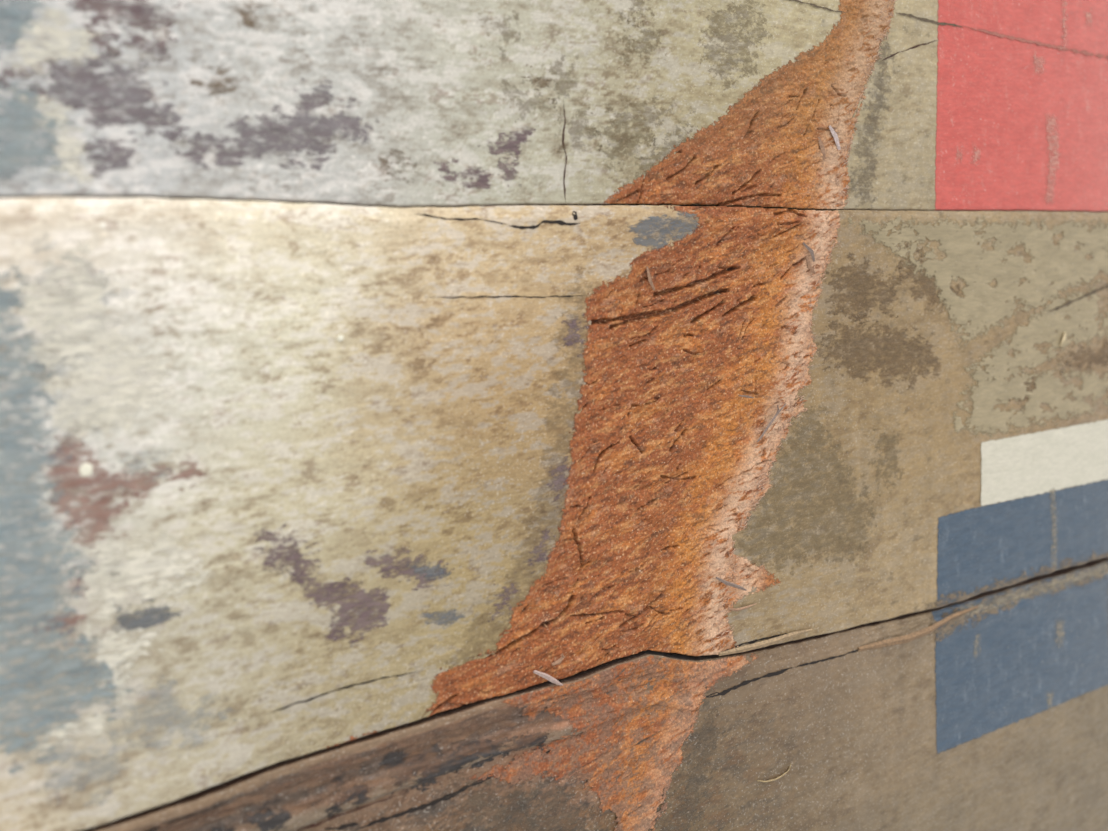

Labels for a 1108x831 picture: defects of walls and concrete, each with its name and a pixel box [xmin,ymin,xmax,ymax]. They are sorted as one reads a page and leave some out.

crack [793,0,847,13]
crack [882,13,1108,61]
crack [419,98,580,229]
crack [722,633,788,652]
crack [271,671,417,713]
crack [706,649,858,697]
crack [149,802,228,831]
crack [298,768,506,831]